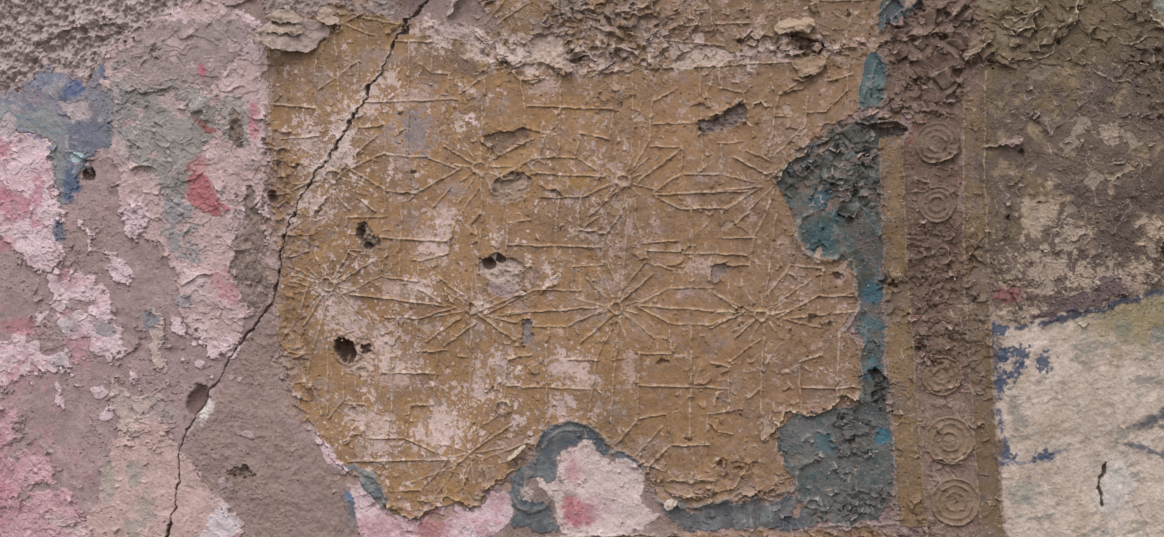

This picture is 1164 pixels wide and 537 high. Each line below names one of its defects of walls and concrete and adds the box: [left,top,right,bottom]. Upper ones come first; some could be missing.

flaking render [425,0,489,81]
peeling [505,0,683,88]
crack [216,0,433,384]
peeling [671,3,969,217]
peeling [928,0,1164,329]
peeling [0,0,404,537]
flaking render [711,263,728,284]
peeling [888,250,968,368]
peeling [762,367,890,458]
crack [166,415,197,537]
peeling [315,432,794,537]